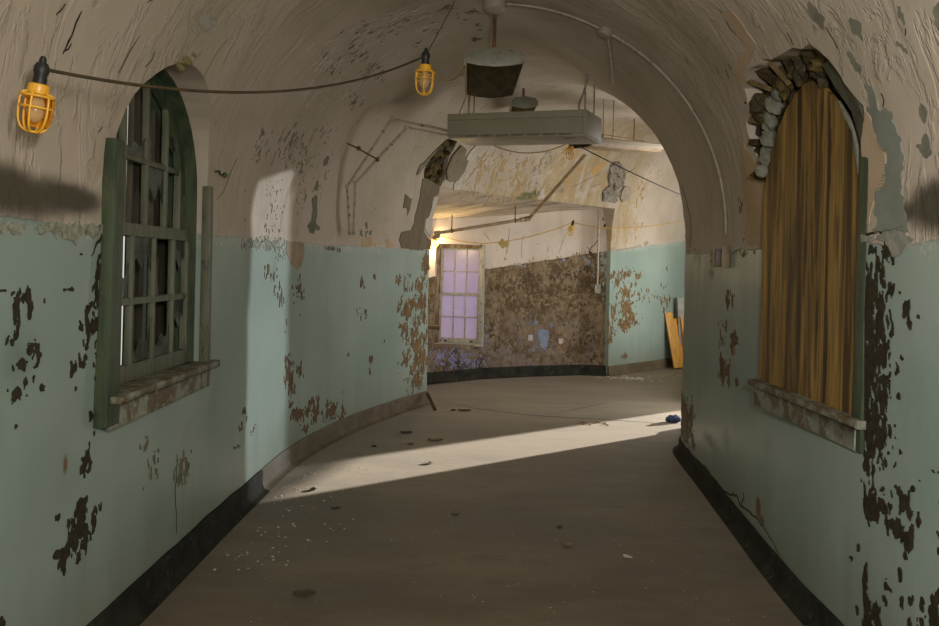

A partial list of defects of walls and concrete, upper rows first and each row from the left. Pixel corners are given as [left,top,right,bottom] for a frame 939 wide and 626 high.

spalling [0,220,103,255]
peeling [241,116,332,308]
flaking render [360,139,672,396]
peeling [0,285,46,405]
peeling [70,253,101,391]
peeling [718,289,739,389]
peeling [80,410,95,478]
peeling [139,436,159,490]
peeling [173,450,192,487]
peeling [283,353,347,434]
peeling [681,389,696,450]
peeling [52,495,102,576]